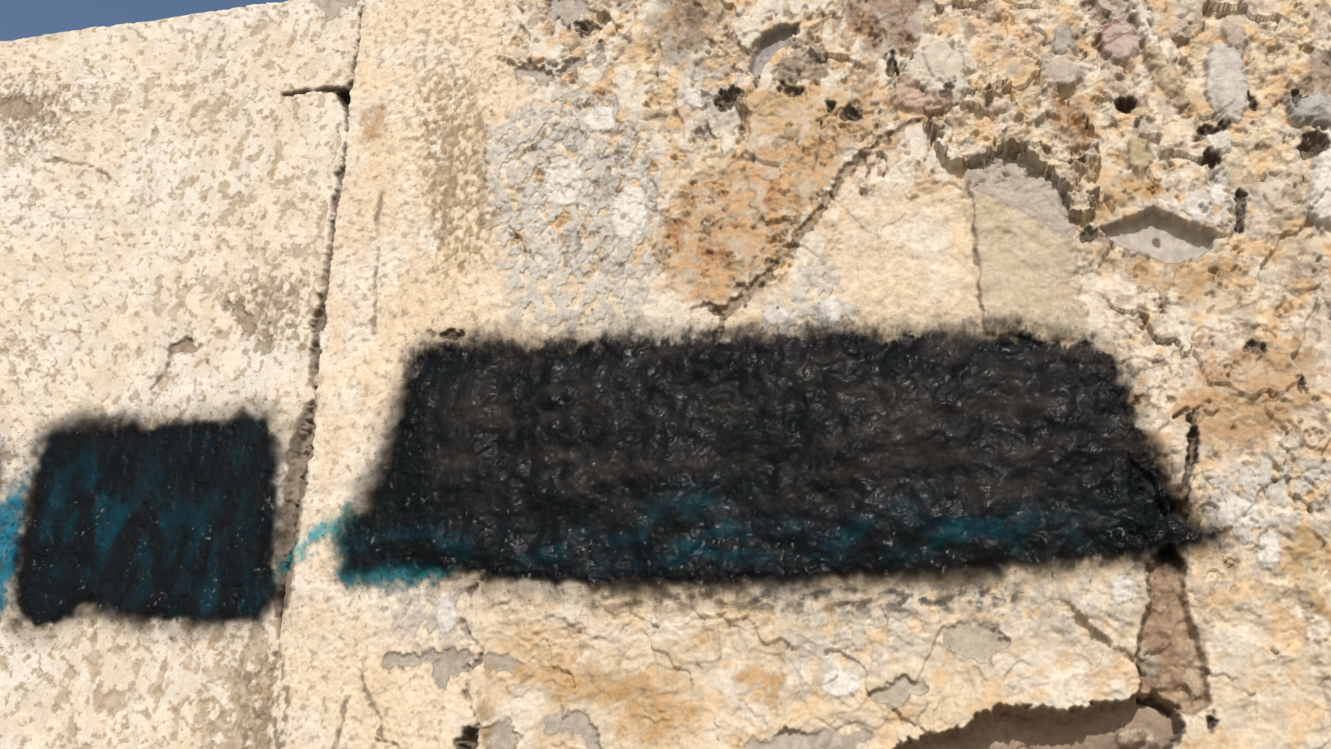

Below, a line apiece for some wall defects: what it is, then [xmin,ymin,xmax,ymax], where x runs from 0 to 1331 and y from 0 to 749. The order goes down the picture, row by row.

crack [691,112,943,340]
crack [275,62,357,617]
crack [333,674,399,749]
crack [463,585,483,698]
spalling [744,727,873,749]
spalling [783,558,1211,749]